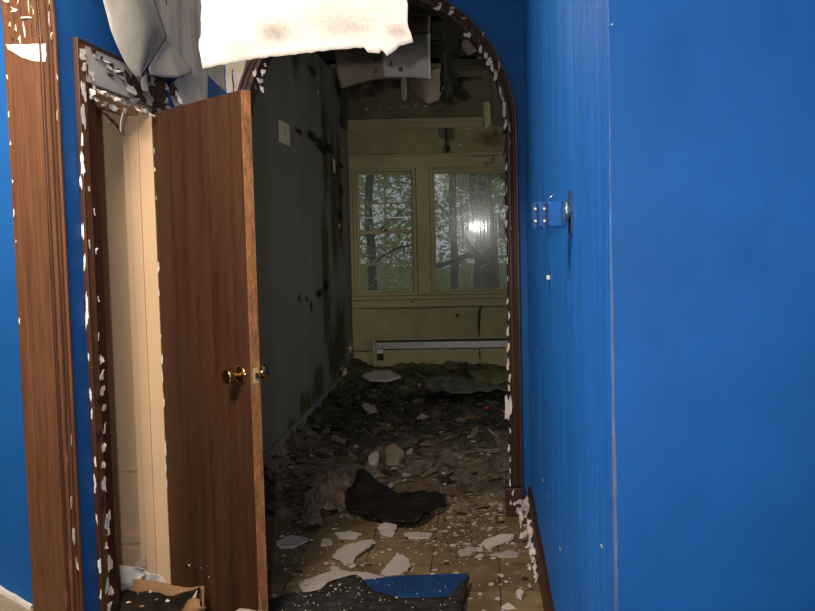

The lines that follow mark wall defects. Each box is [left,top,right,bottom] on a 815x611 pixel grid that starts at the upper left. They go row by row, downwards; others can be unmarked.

peeling [3,0,53,62]
flaking render [79,0,267,191]
peeling [461,17,511,244]
damp [296,113,345,381]
peeling [89,355,106,419]
peeling [94,422,114,611]
peeling [505,276,538,588]